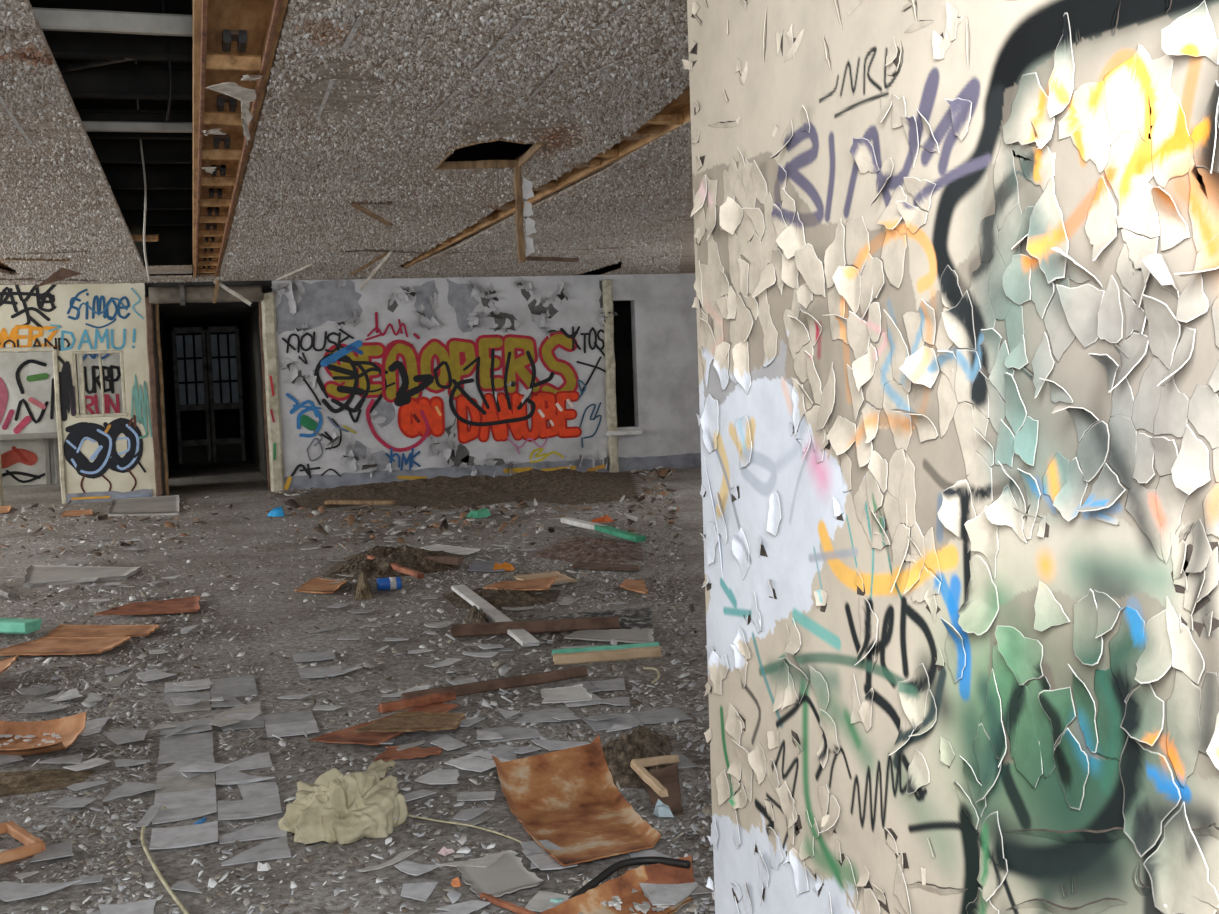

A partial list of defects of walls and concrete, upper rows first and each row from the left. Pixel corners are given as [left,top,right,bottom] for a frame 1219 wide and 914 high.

spalling [434,138,545,170]
peeling [271,279,363,340]
peeling [387,278,569,337]
peeling [598,281,618,326]
peeling [690,0,1219,914]